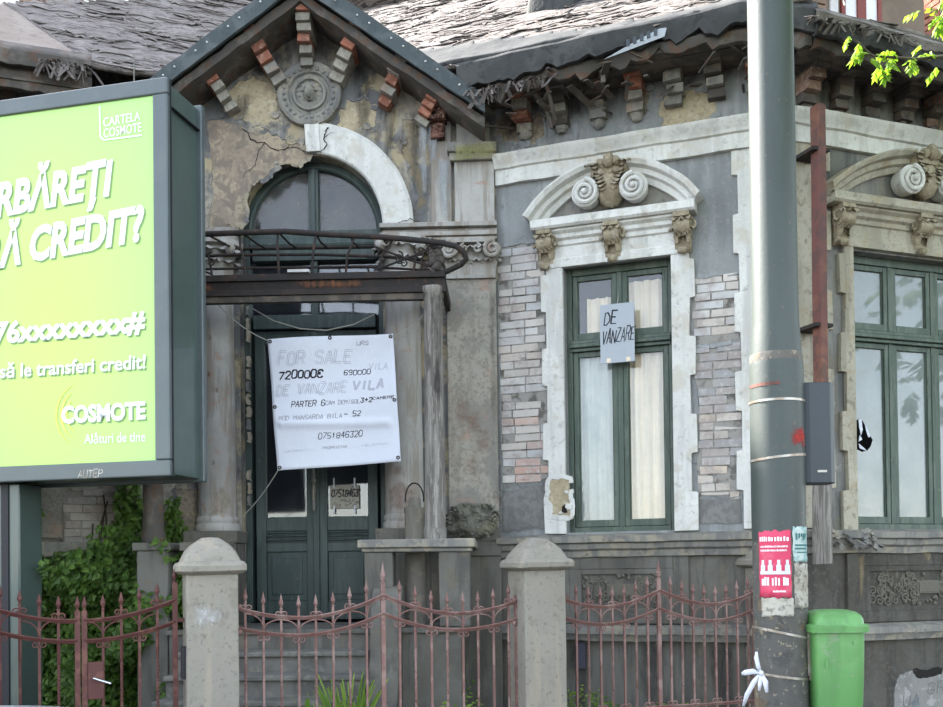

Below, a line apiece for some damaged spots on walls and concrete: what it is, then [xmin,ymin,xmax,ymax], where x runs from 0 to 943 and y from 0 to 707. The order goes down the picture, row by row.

crack [242,127,332,174]
spalling [642,84,721,128]
flaking render [496,239,575,521]
flaking render [690,271,744,501]